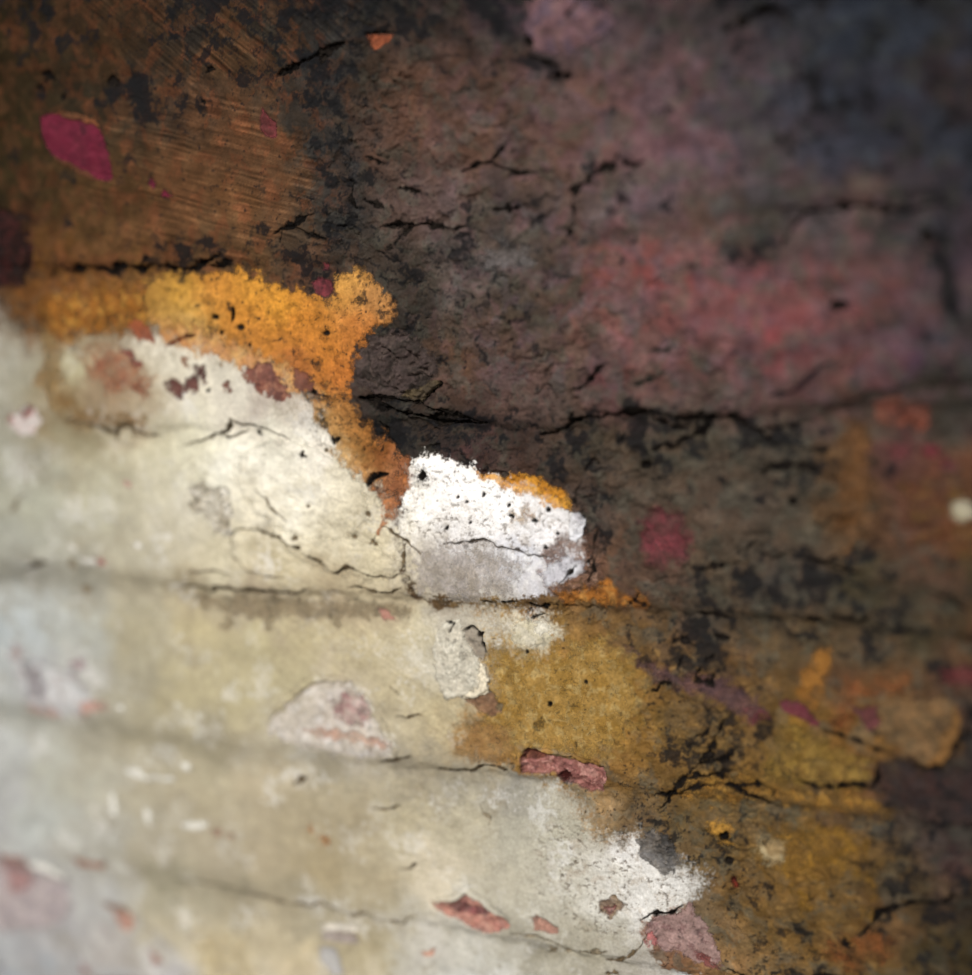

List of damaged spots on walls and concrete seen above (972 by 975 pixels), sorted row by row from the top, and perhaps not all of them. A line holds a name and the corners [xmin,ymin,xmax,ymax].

rust [39,265,411,535]
crack [367,472,389,487]
crack [181,491,421,595]
crack [447,538,547,557]
rust [795,649,831,708]
peeling [268,674,399,759]
spalling [520,747,607,791]
rust [677,724,889,816]
rust [706,821,734,845]
spalling [434,885,510,933]
crack [514,905,683,975]
peeling [644,902,724,969]